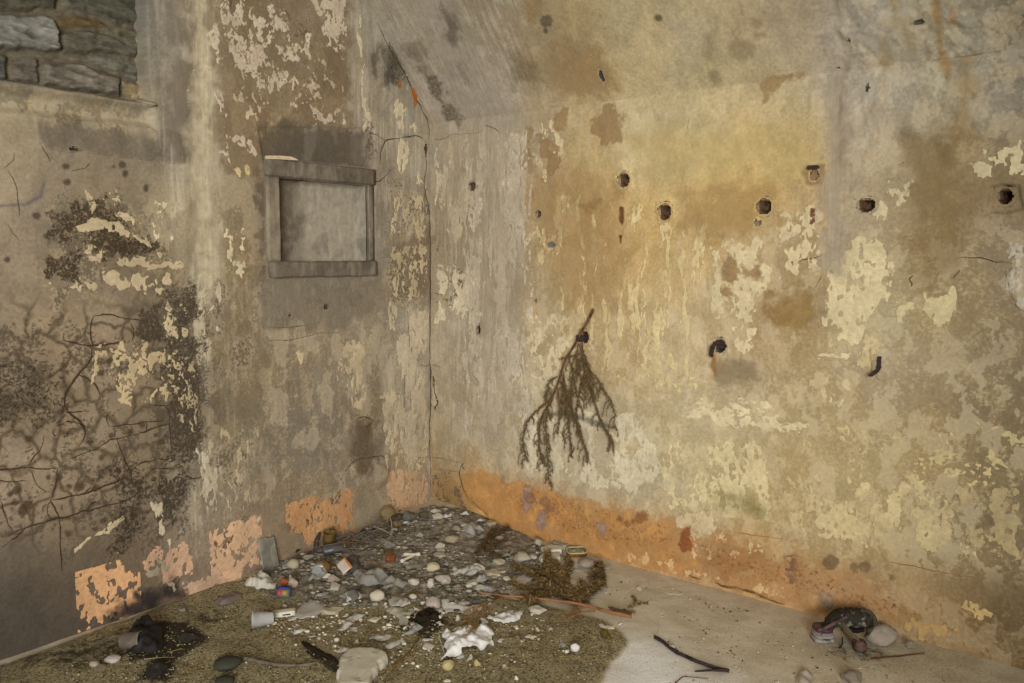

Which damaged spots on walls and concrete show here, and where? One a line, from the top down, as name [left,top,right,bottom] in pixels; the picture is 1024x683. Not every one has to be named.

peeling [206,0,372,177]
leakage [415,0,502,126]
peeling [49,189,222,432]
crack [371,26,500,516]
peeling [380,99,1024,589]
peeling [74,424,262,633]
peeling [286,486,355,546]
leakage [522,487,554,531]
leakage [618,512,647,526]
peeling [752,583,784,602]
leakage [823,555,839,569]